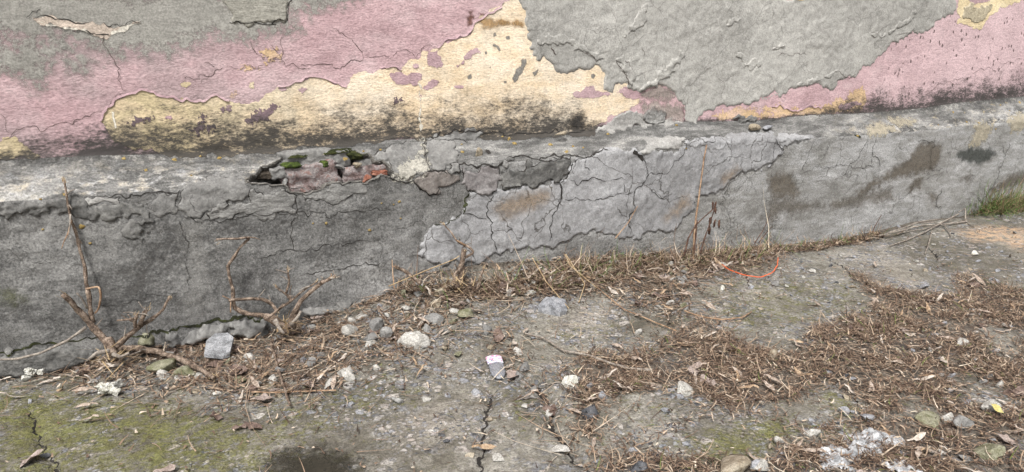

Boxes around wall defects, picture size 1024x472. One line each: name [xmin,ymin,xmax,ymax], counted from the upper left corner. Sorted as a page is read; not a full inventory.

peeling [957,0,1021,30]
peeling [100,0,641,195]
crack [390,65,741,239]
water stain [571,114,585,128]
peeling [711,85,867,122]
water stain [832,142,941,206]
water stain [957,148,996,164]
crack [84,176,498,307]